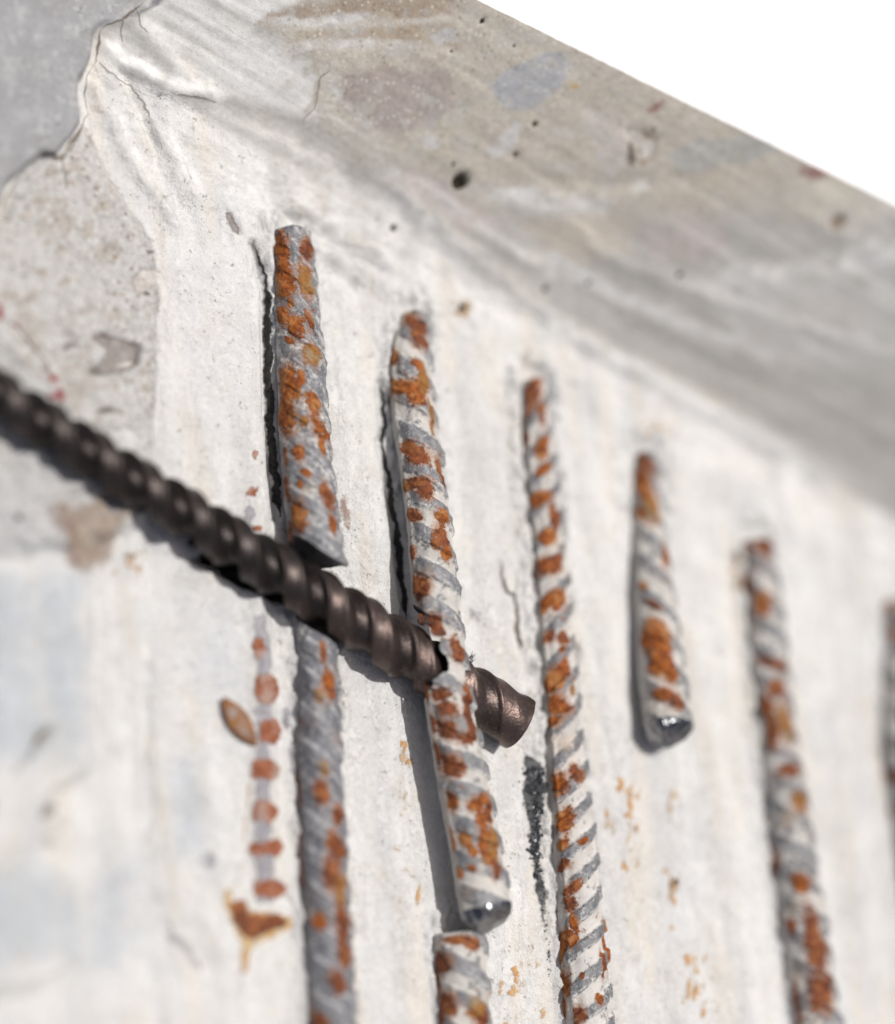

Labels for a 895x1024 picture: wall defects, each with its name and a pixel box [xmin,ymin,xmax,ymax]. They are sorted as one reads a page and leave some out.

crack [1,3,150,219]
crack [178,94,215,102]
spalling [274,225,349,568]
corrosion [222,615,295,972]
spalling [295,615,358,1024]
corrosion [400,741,414,765]
spalling [390,309,512,1024]
corrosion [499,962,539,996]
spalling [523,377,615,1024]
corrosion [617,777,641,872]
spalling [632,451,694,749]
spalling [742,538,845,1024]